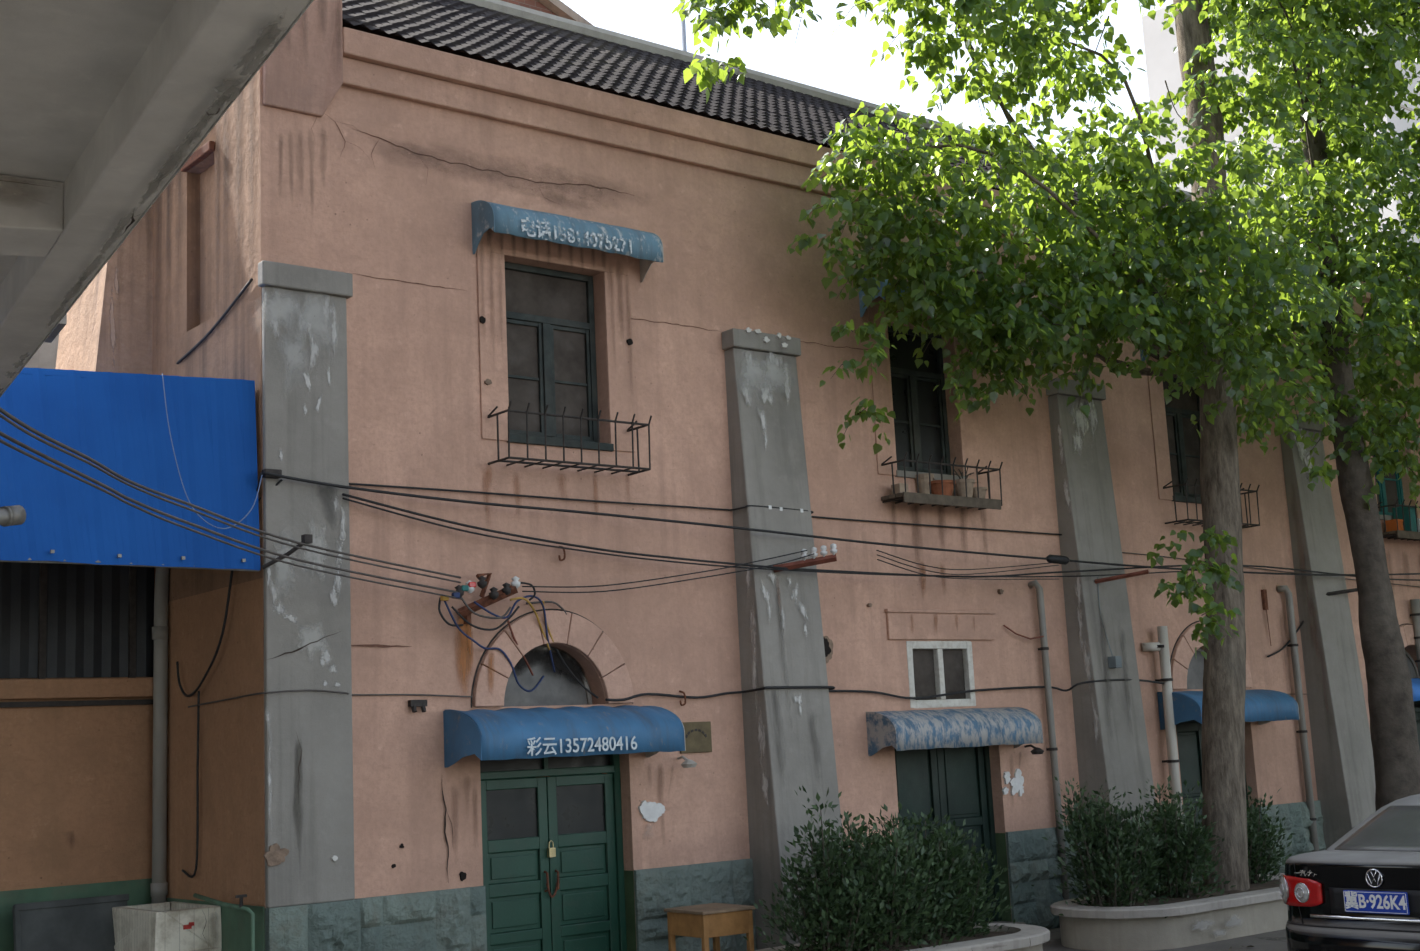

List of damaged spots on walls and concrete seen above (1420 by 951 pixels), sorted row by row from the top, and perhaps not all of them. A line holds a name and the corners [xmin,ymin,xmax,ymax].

crack [311,116,634,206]
peeling [744,327,791,445]
corrosion [458,617,472,682]
peeling [1002,769,1024,796]
crack [442,789,453,883]